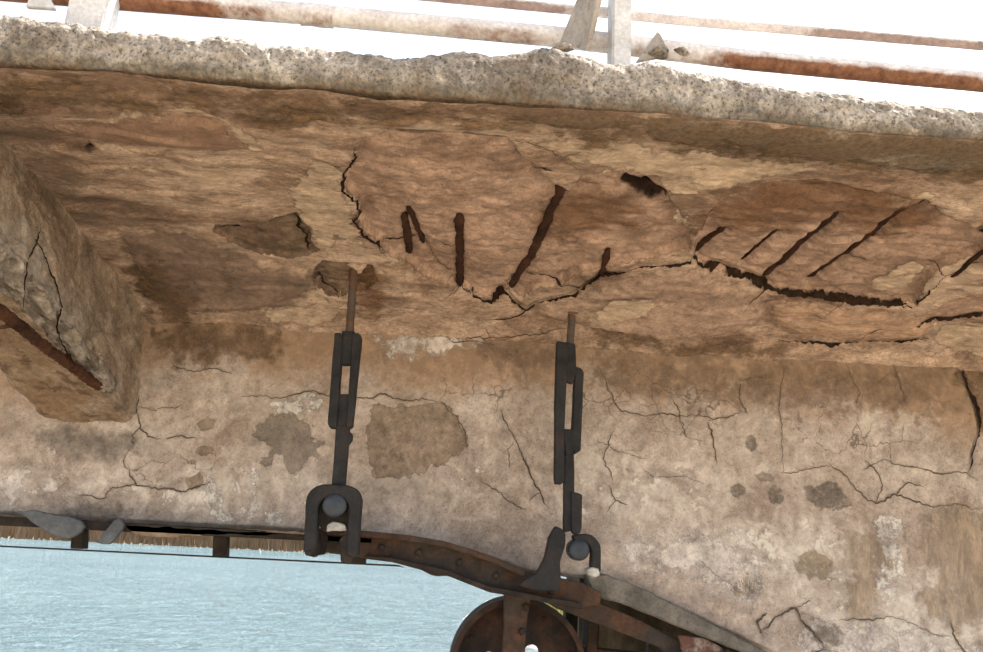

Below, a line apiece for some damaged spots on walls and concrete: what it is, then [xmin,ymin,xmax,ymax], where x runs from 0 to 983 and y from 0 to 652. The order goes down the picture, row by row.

crack [507,139,580,171]
spalling [213,130,983,332]
spalling [0,229,116,393]
crack [340,148,983,512]
peeling [919,295,983,359]
crack [173,365,229,373]
crack [240,390,329,399]
crack [78,397,211,499]
crack [756,600,838,652]
crack [840,616,966,652]